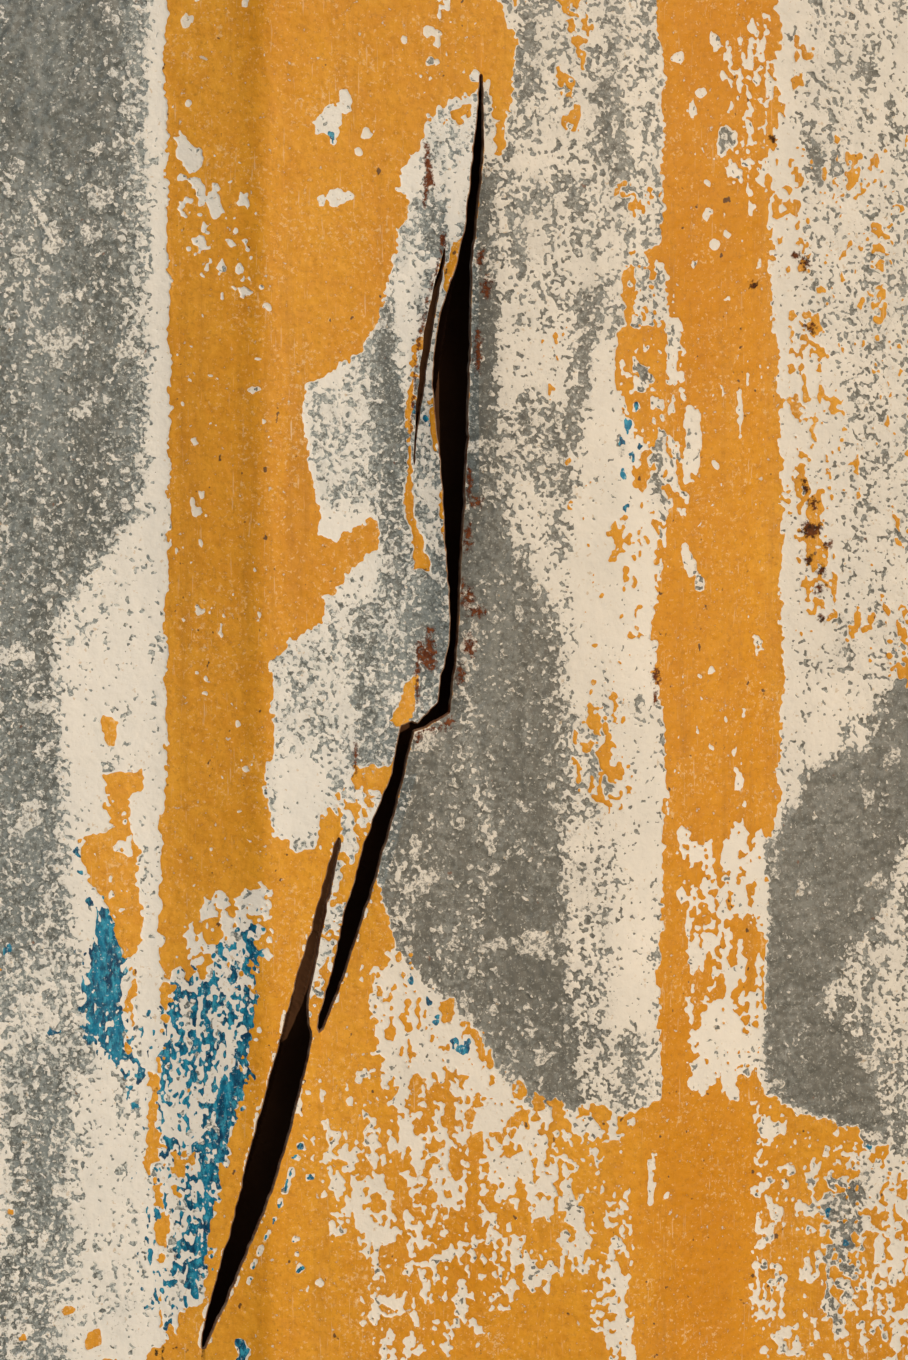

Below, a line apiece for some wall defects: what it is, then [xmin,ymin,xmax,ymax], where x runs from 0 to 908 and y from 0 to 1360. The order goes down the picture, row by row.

peeling [0,0,274,1360]
crack [413,248,456,464]
peeling [251,0,908,1360]